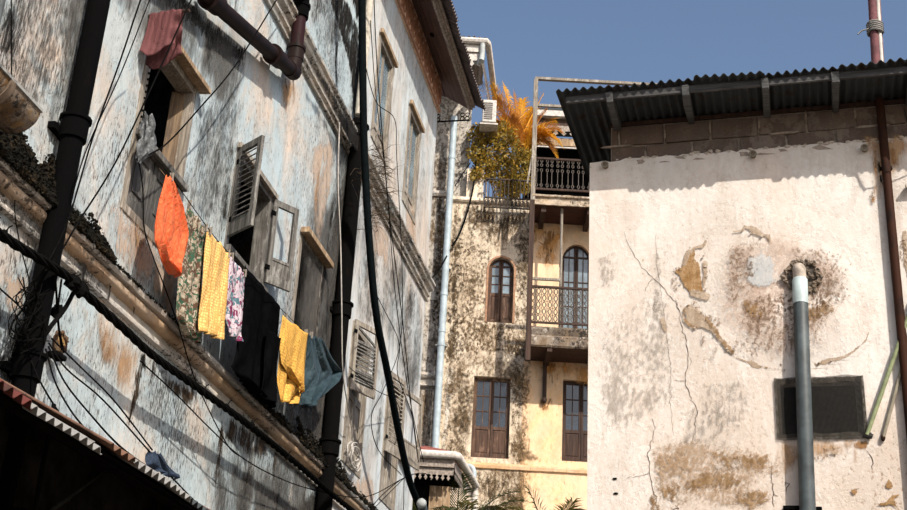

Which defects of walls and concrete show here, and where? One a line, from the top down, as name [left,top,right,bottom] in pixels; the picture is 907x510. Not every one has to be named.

leakage [299,0,359,352]
leakage [287,394,326,444]
leakage [358,158,560,510]
crack [626,240,698,510]
spalling [671,238,768,368]
leakage [728,244,794,356]
leakage [794,247,851,340]